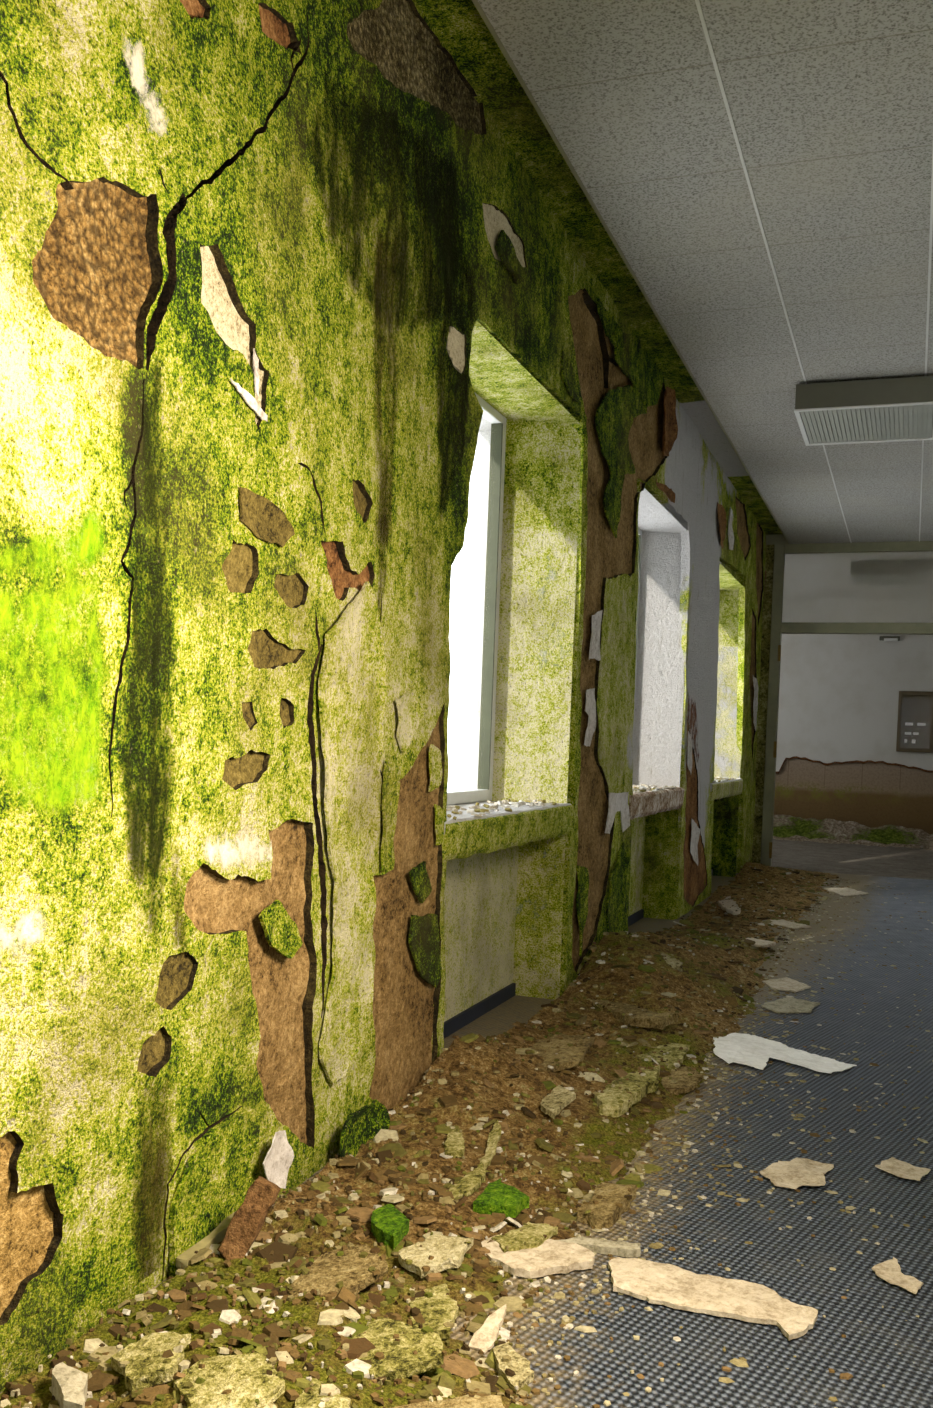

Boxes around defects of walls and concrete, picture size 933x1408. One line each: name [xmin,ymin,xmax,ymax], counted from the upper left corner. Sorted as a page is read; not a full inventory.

crack [0,71,74,190]
spalling [346,0,487,136]
spalling [32,176,163,369]
leakage [126,370,171,926]
peeling [221,487,295,594]
spalling [353,479,373,523]
spalling [561,288,678,973]
peeling [184,541,445,1188]
crack [307,617,328,1018]
spalling [684,718,708,907]
spalling [774,756,933,835]
spalling [0,1131,64,1325]